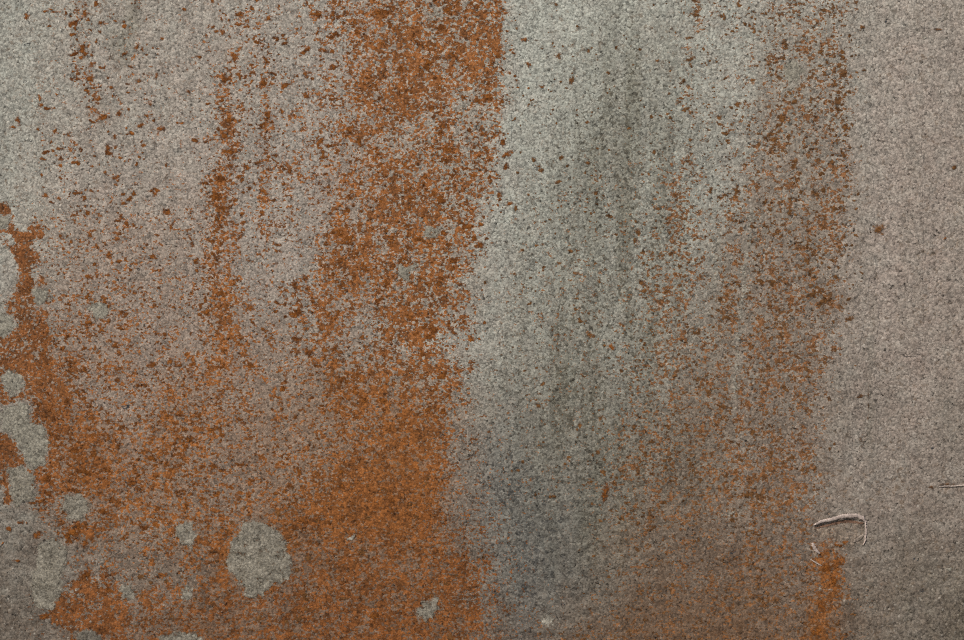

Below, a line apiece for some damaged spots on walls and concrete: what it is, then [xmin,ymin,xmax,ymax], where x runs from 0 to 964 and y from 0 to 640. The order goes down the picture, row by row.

rust [525,0,884,640]